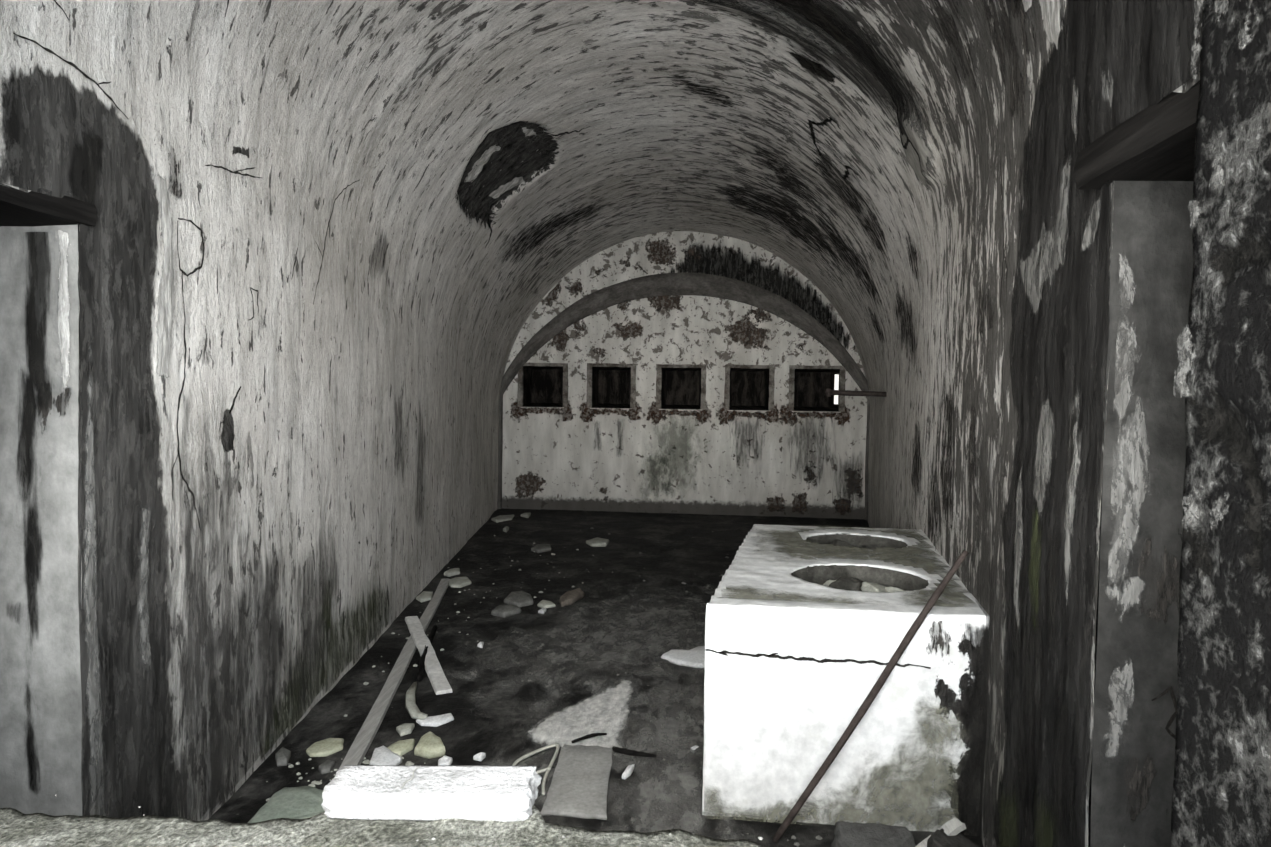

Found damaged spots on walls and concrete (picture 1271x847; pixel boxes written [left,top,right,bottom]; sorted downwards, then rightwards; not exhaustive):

flaking render [1238,0,1259,50]
flaking render [456,121,590,248]
flaking render [502,204,601,262]
water stain [670,244,855,351]
flaking render [896,231,919,365]
water stain [645,422,690,495]
water stain [732,418,762,462]
water stain [791,417,862,505]
flaking render [911,394,978,551]
flaking render [927,0,1228,847]
water stain [965,437,1071,847]
crack [1152,687,1177,739]